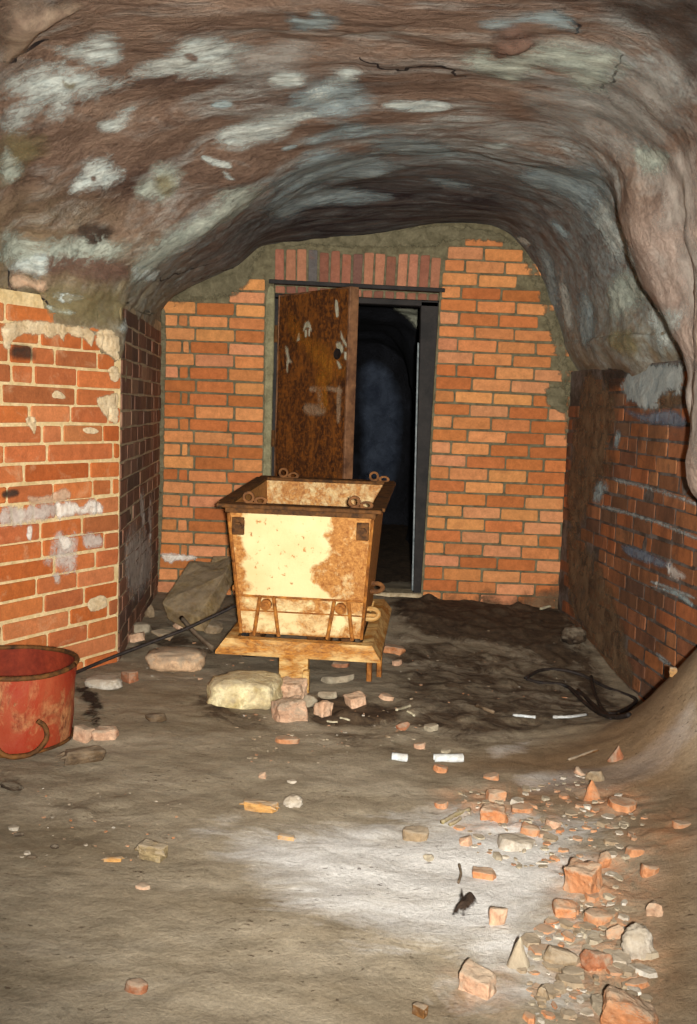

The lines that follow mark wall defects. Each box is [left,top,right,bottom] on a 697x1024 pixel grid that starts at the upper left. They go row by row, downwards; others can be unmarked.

leakage [486,13,575,29]
leakage [613,1,697,70]
crack [359,57,466,77]
crack [588,54,623,105]
leakage [385,101,447,112]
leakage [341,126,452,158]
leakage [202,156,232,179]
leakage [43,256,129,320]
leakage [541,252,572,327]
leakage [677,237,697,316]
leakage [0,500,103,524]
leakage [47,532,76,582]